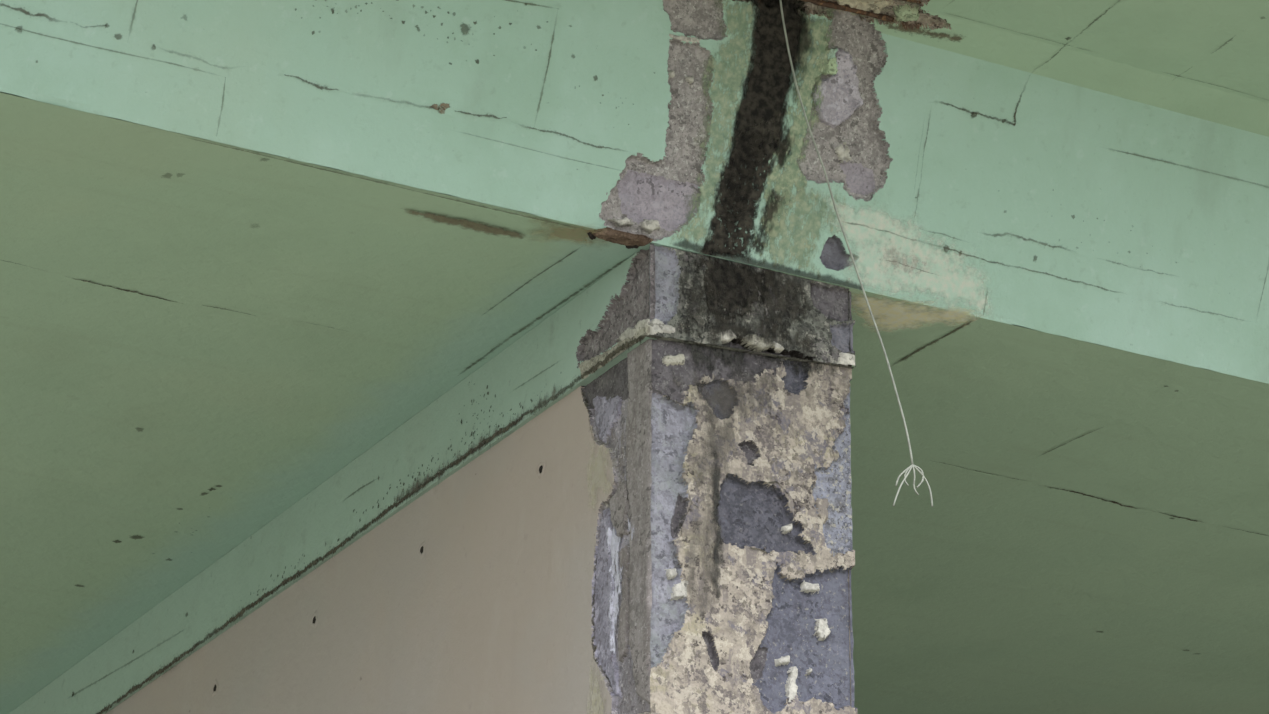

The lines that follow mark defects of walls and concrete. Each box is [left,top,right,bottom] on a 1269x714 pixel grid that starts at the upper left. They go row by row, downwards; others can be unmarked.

crack [5,5,47,17]
corrosion [887,21,962,41]
crack [284,74,337,90]
crack [458,111,608,148]
peeling [796,0,951,202]
crack [945,99,1021,126]
water stain [675,0,989,375]
corrosion [408,210,522,238]
peeling [820,235,857,271]
peeling [576,0,815,714]
peeling [717,282,858,714]
water stain [606,521,634,654]